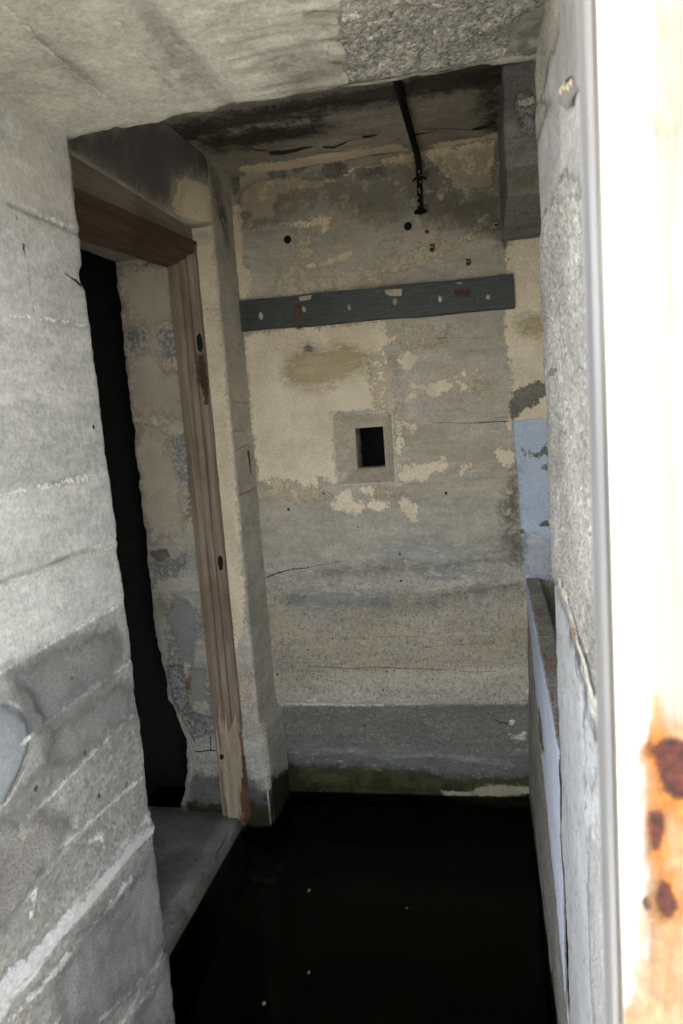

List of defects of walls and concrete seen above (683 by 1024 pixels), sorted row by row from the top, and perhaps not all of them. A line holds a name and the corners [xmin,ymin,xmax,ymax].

leakage [73,63,510,198]
peeling [230,132,499,301]
corrosion [196,354,208,405]
peeling [243,320,489,528]
crack [266,561,340,604]
corrosion [629,693,683,1010]